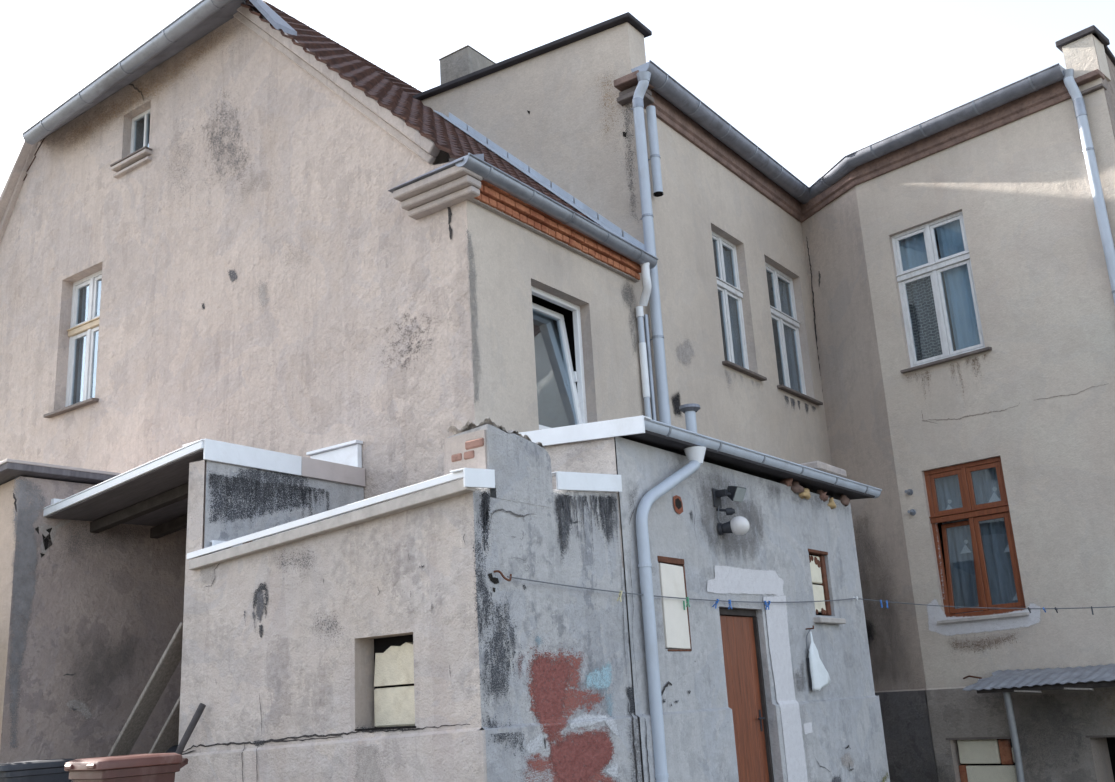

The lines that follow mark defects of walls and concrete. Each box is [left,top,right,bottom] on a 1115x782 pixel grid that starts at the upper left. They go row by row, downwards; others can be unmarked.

water stain [163,83,273,207]
crack [921,383,1109,424]
water stain [208,468,330,529]
water stain [554,493,619,566]
peeling [5,475,71,753]
water stain [243,583,269,637]
water stain [469,491,529,761]